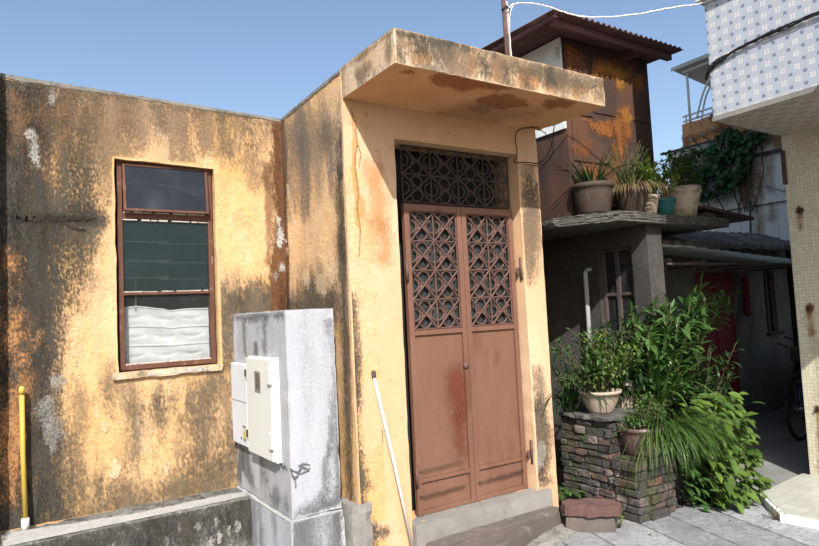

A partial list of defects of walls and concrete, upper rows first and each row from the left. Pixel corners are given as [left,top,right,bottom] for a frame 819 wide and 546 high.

leakage [345,29,604,102]
rust [555,43,643,92]
rust [583,107,638,180]
crack [1,212,95,231]
rust [268,120,290,311]
leakage [521,168,542,286]
leakage [0,76,371,546]
leakage [372,522,389,546]